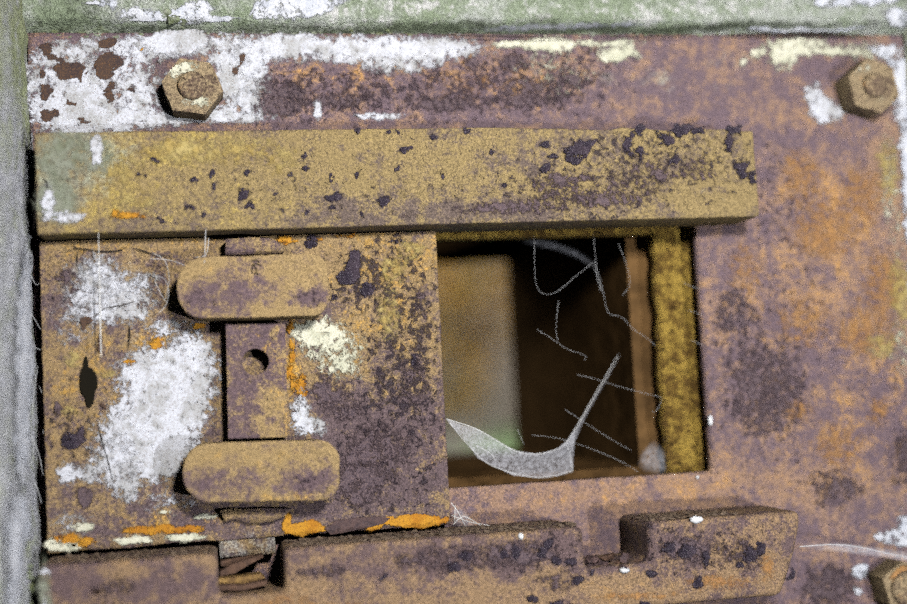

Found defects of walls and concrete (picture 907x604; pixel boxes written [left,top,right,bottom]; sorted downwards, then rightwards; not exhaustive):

leakage [491,22,643,31]
corrosion [39,38,135,122]
peeling [26,0,648,223]
leakage [734,26,907,277]
corrosion [452,154,717,216]
corrosion [61,348,115,414]
peeling [26,246,226,604]
corrosion [282,512,326,538]
corrosion [365,513,449,532]
leakage [874,507,907,547]
corrosion [219,552,268,591]
leakage [851,563,870,596]